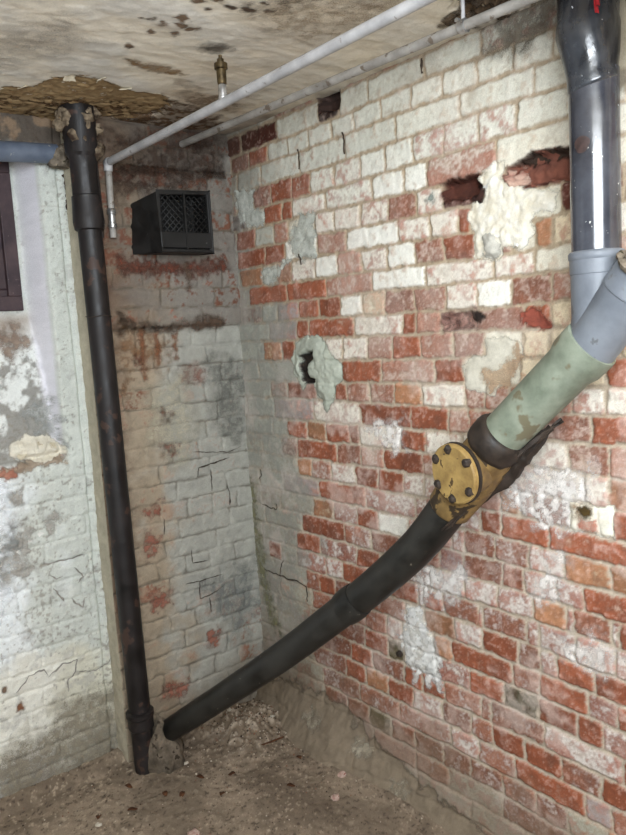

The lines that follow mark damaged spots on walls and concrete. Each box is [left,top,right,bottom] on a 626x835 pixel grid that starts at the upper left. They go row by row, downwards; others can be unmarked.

leakage [140,15,200,35]
leakage [192,0,391,38]
spalling [438,0,510,28]
peeling [0,75,172,123]
spalling [503,145,570,188]
spalling [441,174,489,205]
crack [197,446,241,505]
crack [188,551,223,611]
crack [264,562,308,602]
leakage [411,565,468,605]
crack [16,656,111,693]
leakage [412,665,443,693]